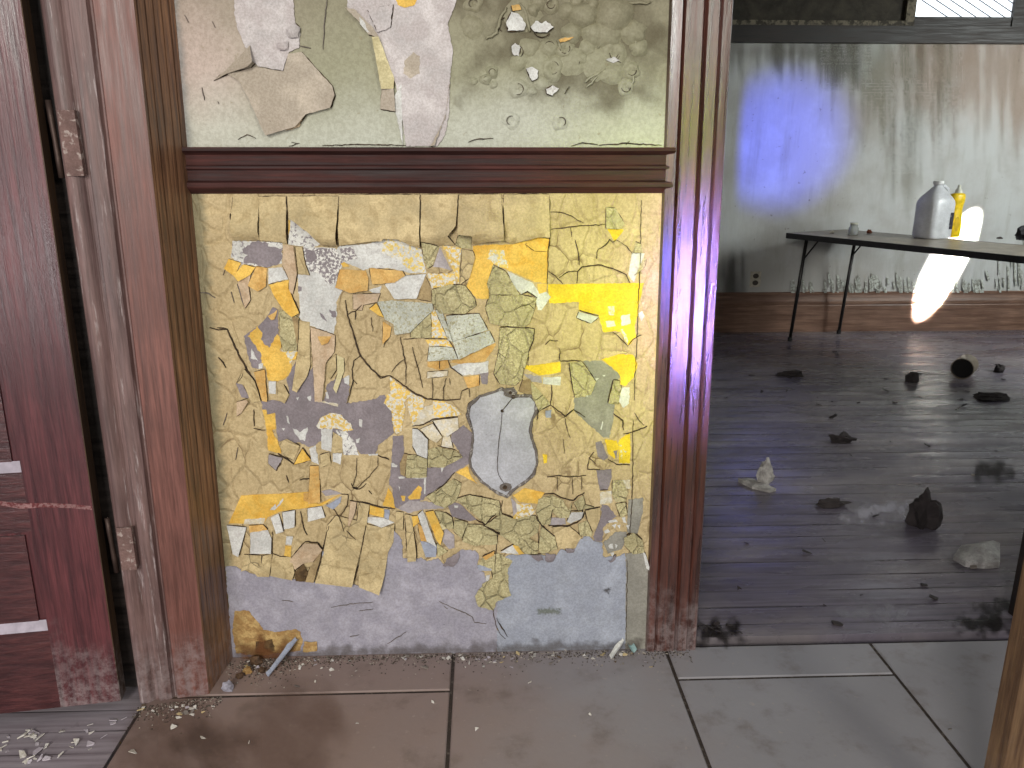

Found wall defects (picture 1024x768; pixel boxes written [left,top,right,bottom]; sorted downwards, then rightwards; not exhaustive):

peeling [214,0,336,136]
peeling [345,0,457,147]
peeling [790,261,1024,293]
crack [345,300,470,440]
flaking render [224,193,652,683]
crack [464,200,647,562]